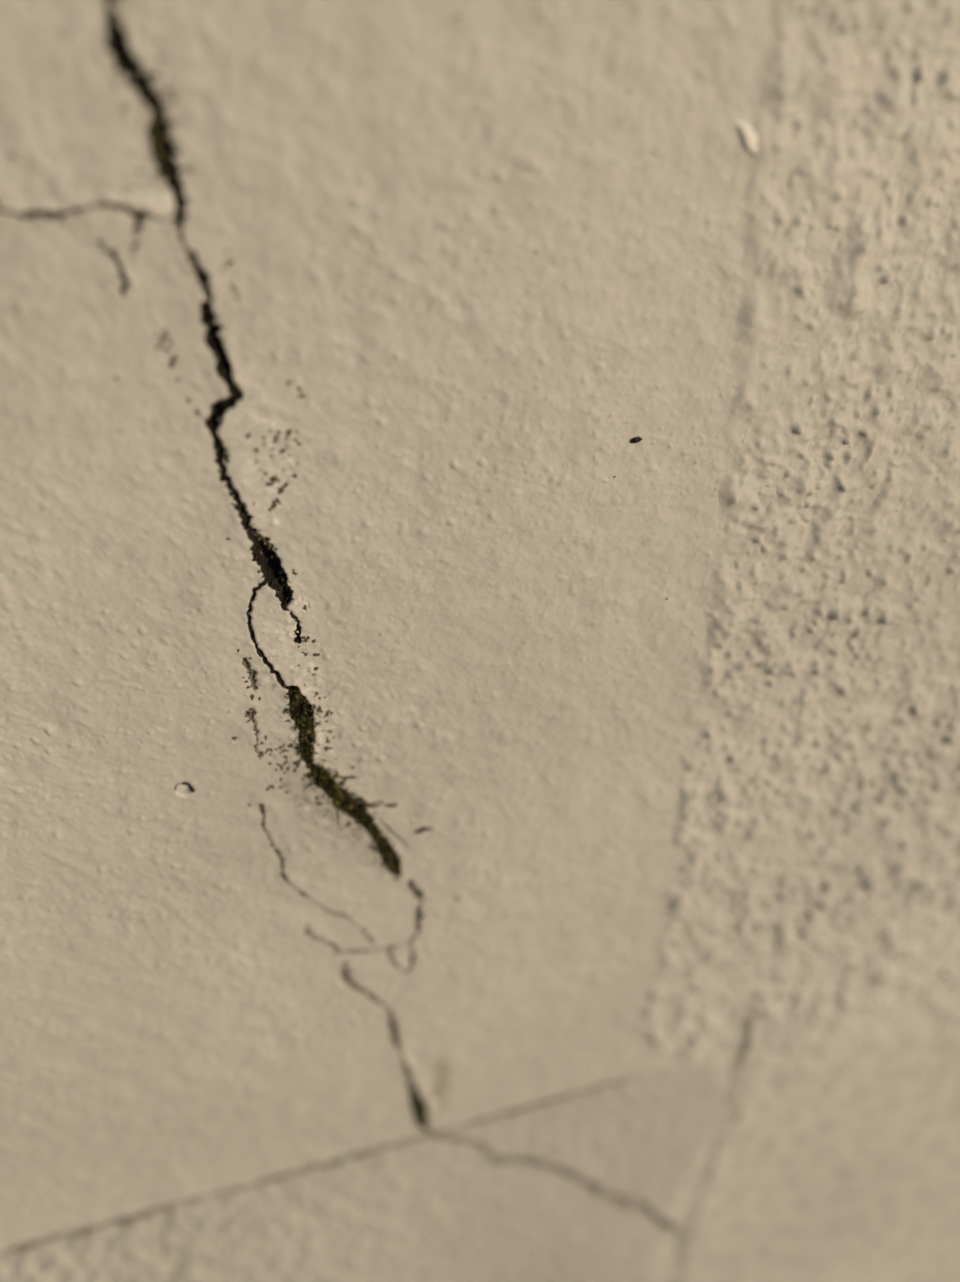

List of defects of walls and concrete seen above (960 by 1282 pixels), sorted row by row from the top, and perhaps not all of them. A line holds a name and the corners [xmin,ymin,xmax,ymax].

crack [0,0,758,1282]